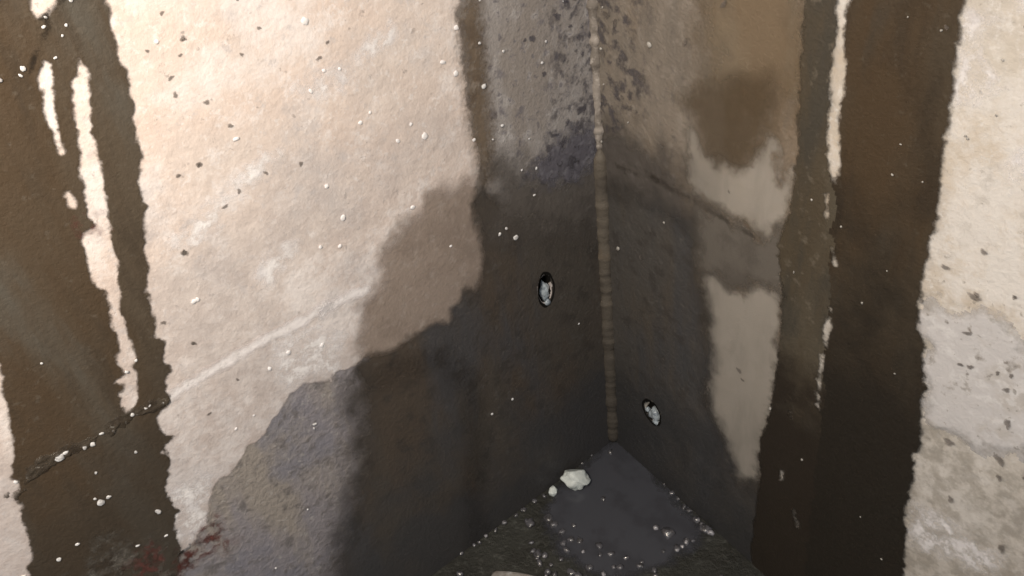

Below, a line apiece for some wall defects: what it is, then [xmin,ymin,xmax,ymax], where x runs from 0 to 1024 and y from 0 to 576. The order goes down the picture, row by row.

damp [0,0,611,576]
damp [586,0,975,576]
damp [908,511,996,570]